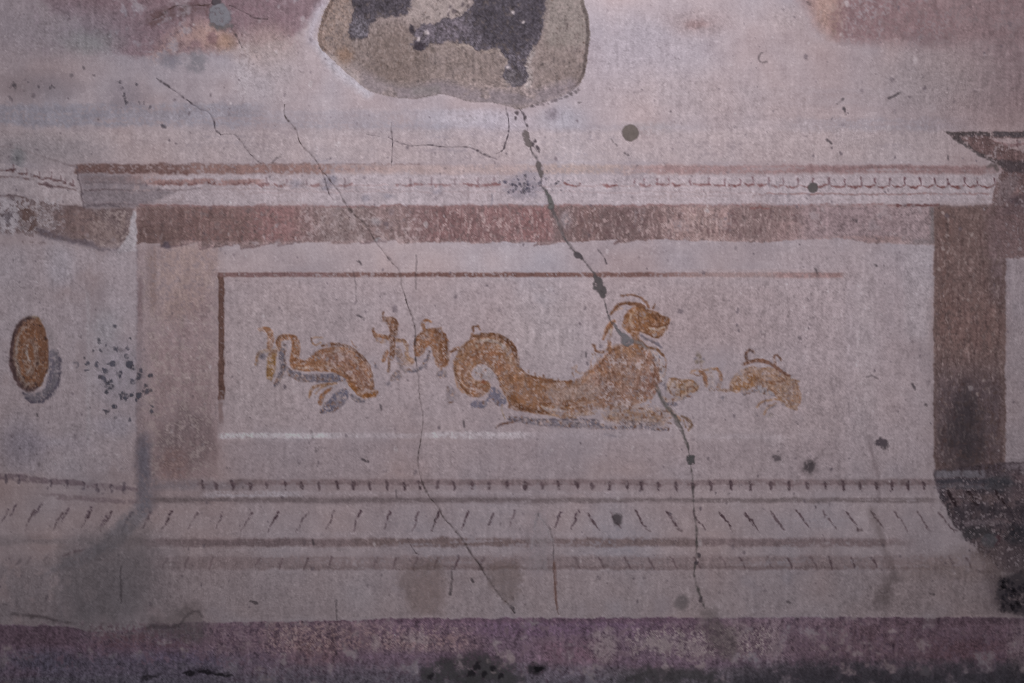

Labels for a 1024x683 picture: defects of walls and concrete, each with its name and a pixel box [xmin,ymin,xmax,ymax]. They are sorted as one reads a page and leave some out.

flaking render [318,0,591,110]
crack [476,111,554,211]
crack [567,242,646,348]
crack [657,387,695,497]